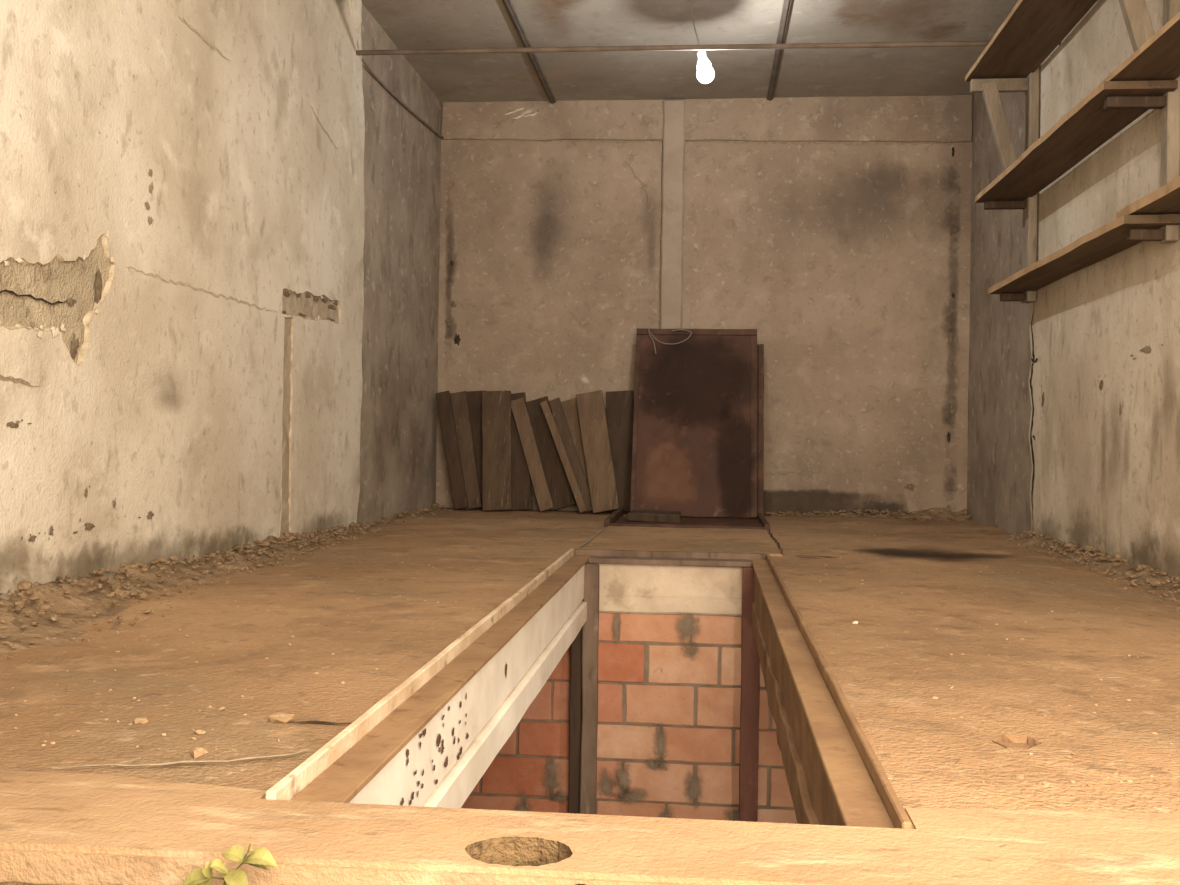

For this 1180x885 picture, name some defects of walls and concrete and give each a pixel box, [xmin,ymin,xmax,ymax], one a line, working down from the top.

flaking render [0,230,115,366]
spalling [279,288,341,536]